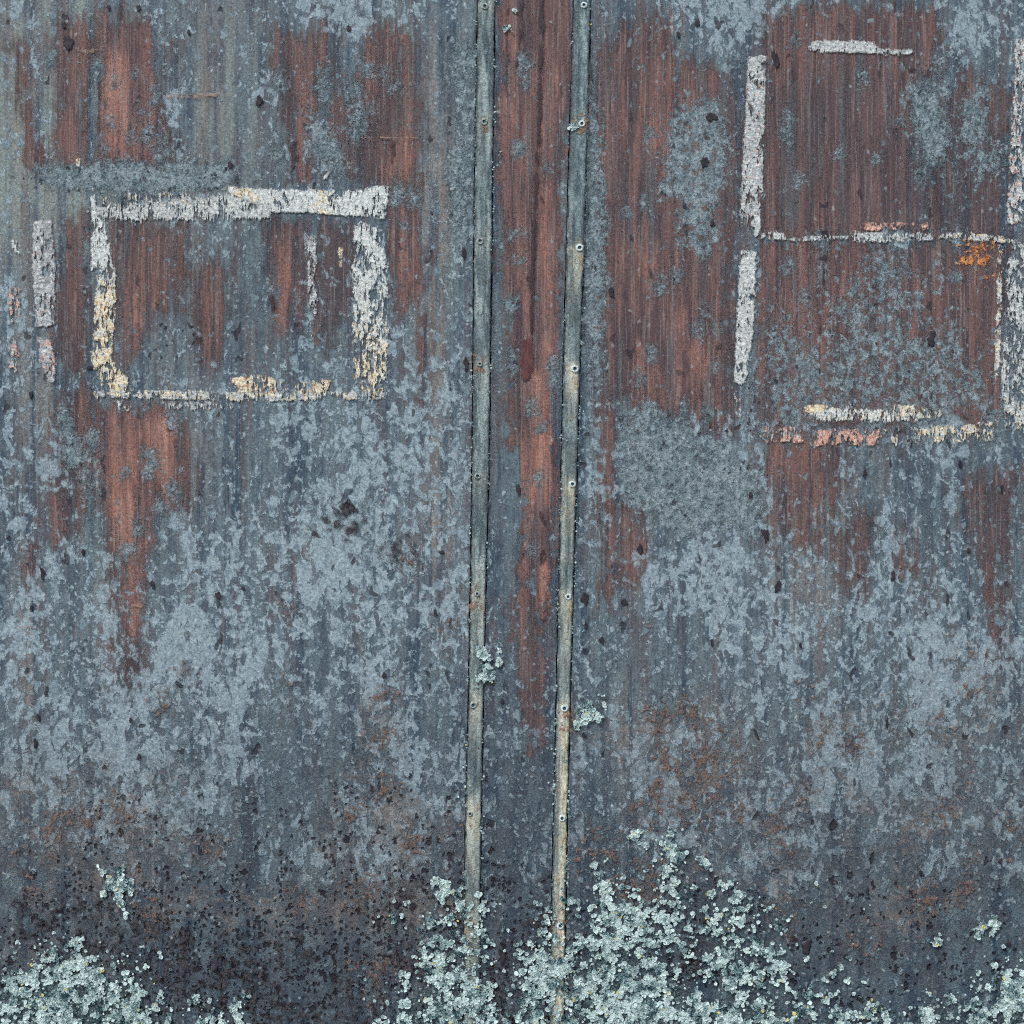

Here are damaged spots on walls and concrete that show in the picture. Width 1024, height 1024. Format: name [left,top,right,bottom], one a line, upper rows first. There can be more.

peeling [16,541,46,591]
peeling [14,3,175,174]
peeling [36,206,200,690]
peeling [106,213,238,382]
peeling [264,13,436,405]
peeling [493,0,573,758]
peeling [580,0,1014,629]
corrosion [956,239,999,286]
peeling [958,459,1024,669]
corrosion [8,720,434,1024]
corrosion [478,889,570,1023]
corrosion [566,685,820,983]